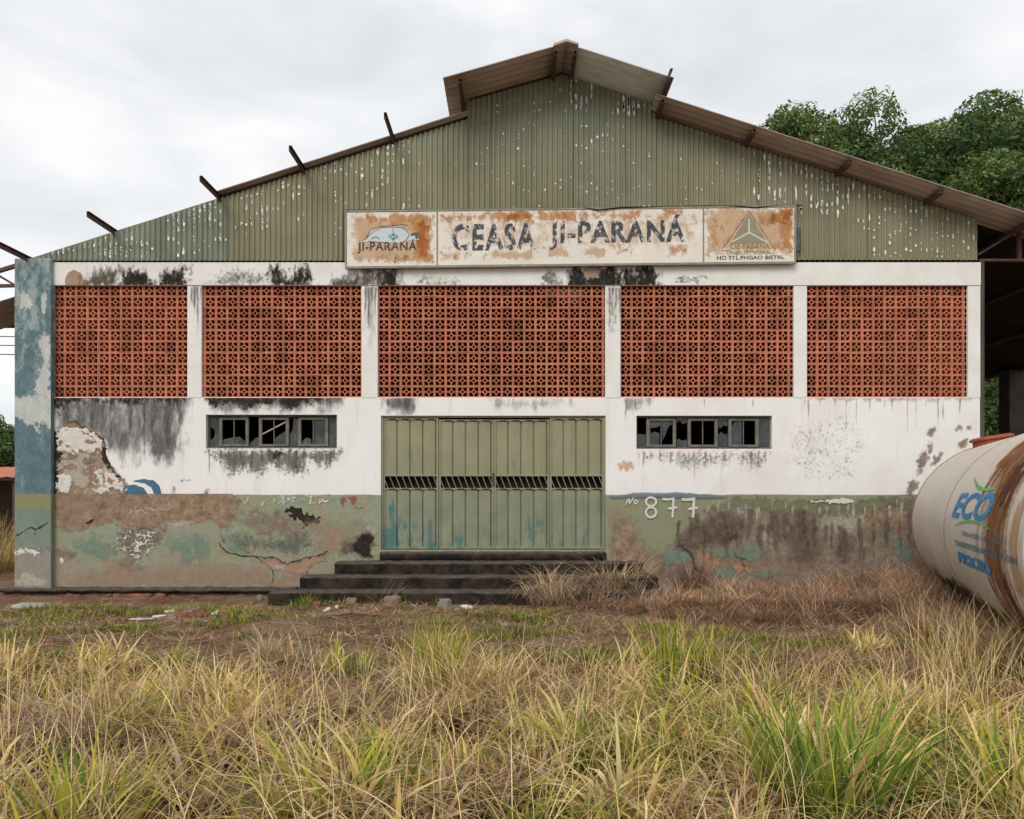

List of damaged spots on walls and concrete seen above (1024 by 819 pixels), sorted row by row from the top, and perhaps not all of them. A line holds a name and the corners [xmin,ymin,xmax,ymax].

peeling [612,95,650,127]
peeling [324,140,409,207]
water stain [218,263,313,285]
water stain [54,398,187,459]
peeling [14,332,333,586]
water stain [208,447,342,476]
peeling [610,427,943,589]
crack [218,542,328,587]
flaking render [341,526,378,558]